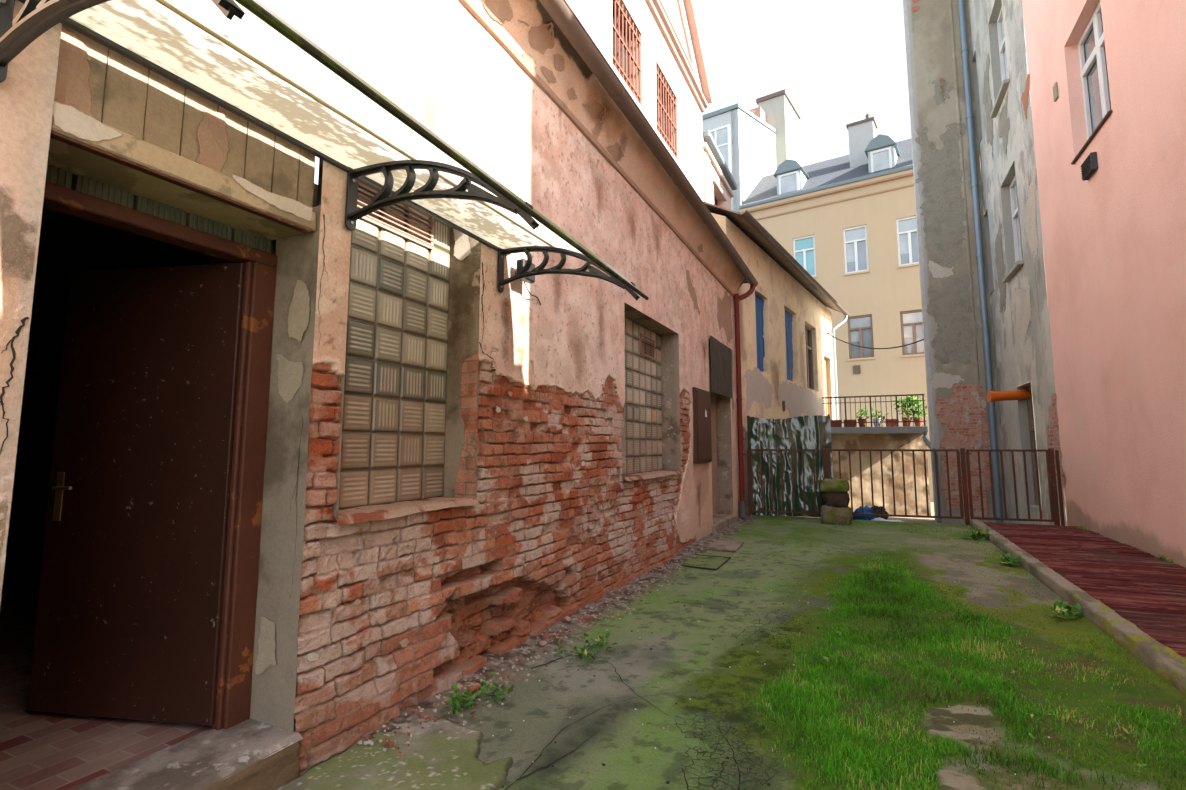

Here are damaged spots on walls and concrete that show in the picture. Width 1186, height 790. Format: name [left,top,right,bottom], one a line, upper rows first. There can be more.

peeling [484,0,606,123]
spalling [927,80,953,104]
spalling [983,53,1030,158]
peeling [288,280,310,342]
spalling [915,123,993,517]
spalling [995,219,1032,346]
crack [0,317,29,454]
spalling [276,353,695,774]
peeling [255,616,276,675]
crack [504,643,785,790]